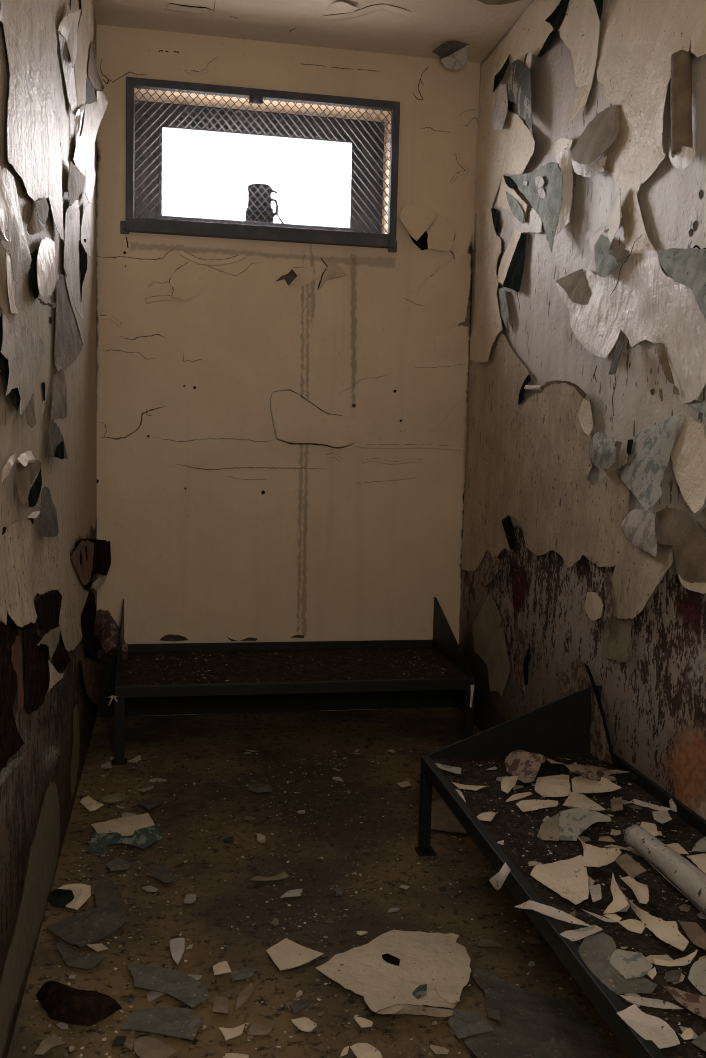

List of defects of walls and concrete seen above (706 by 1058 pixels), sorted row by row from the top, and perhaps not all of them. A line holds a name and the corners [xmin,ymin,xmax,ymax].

crack [323,4,411,21]
crack [97,237,252,276]
crack [98,315,202,362]
peeling [399,0,706,697]
crack [100,406,466,484]
peeling [0,0,163,1058]